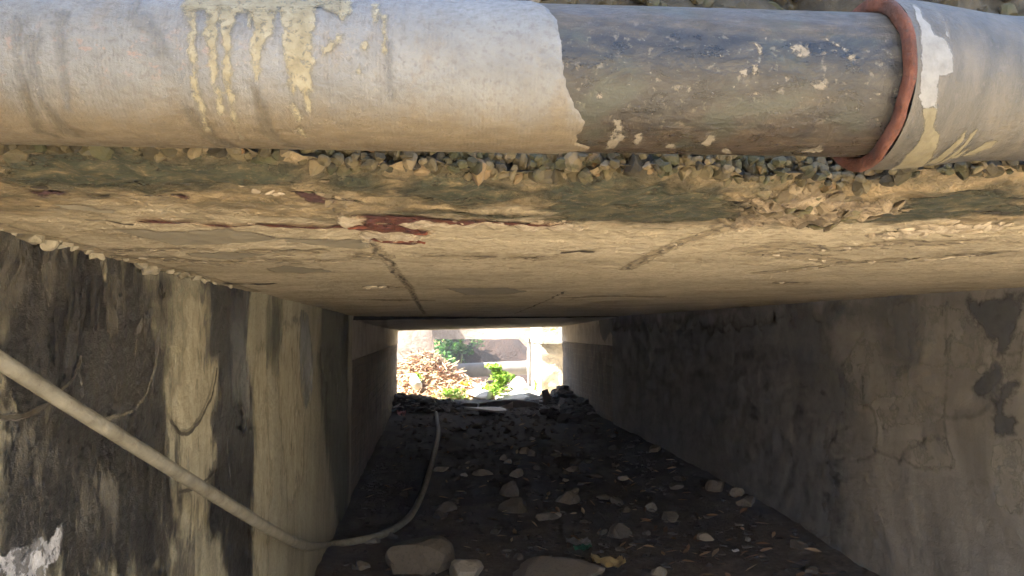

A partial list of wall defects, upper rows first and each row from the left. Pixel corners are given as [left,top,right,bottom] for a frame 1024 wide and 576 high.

spalling [690,0,747,9]
spalling [768,0,799,10]
spalling [976,0,1024,16]
spalling [0,119,1024,269]
crack [367,243,425,314]
crack [621,223,731,270]
water stain [967,293,1024,437]
water stain [0,229,369,576]